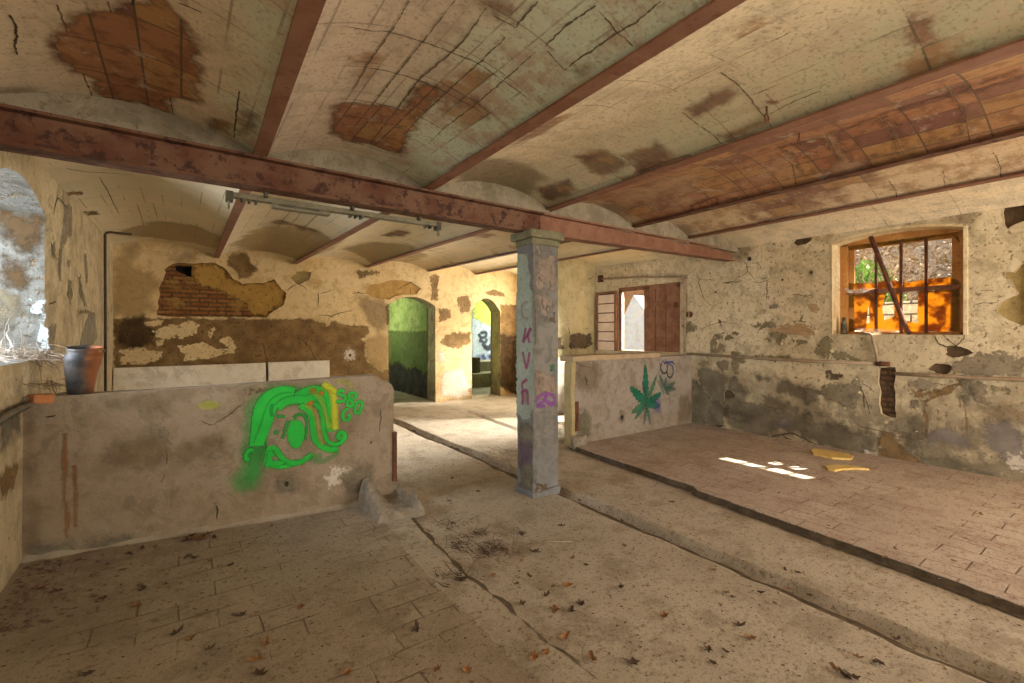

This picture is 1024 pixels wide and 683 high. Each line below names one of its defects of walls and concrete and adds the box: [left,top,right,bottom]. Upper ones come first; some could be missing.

crack [9,15,19,55]
peeling [49,0,203,113]
crack [341,0,661,145]
peeling [329,84,438,153]
peeling [28,298,57,359]
spalling [119,262,286,365]
water stain [113,314,471,399]
water stain [691,367,877,455]
water stain [902,414,996,477]
peeling [878,346,1024,418]
water stain [985,420,1024,459]